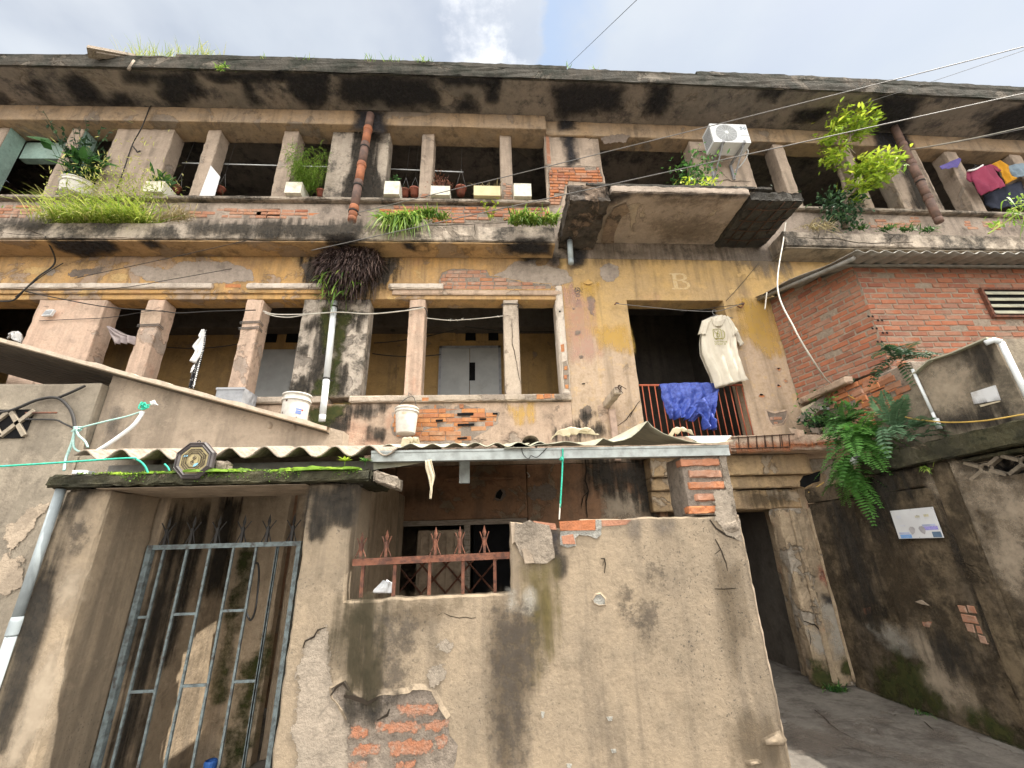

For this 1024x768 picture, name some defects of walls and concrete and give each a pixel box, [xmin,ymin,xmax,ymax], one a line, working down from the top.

water stain [65,70,500,198]
water stain [46,239,120,258]
water stain [290,242,415,395]
flaking render [437,261,620,317]
flaking render [390,397,500,444]
peeling [0,502,50,596]
water stain [0,546,81,767]
water stain [104,497,257,768]
flaking render [290,625,458,768]
peeling [511,522,534,564]
water stain [530,530,567,635]
water stain [910,627,980,717]